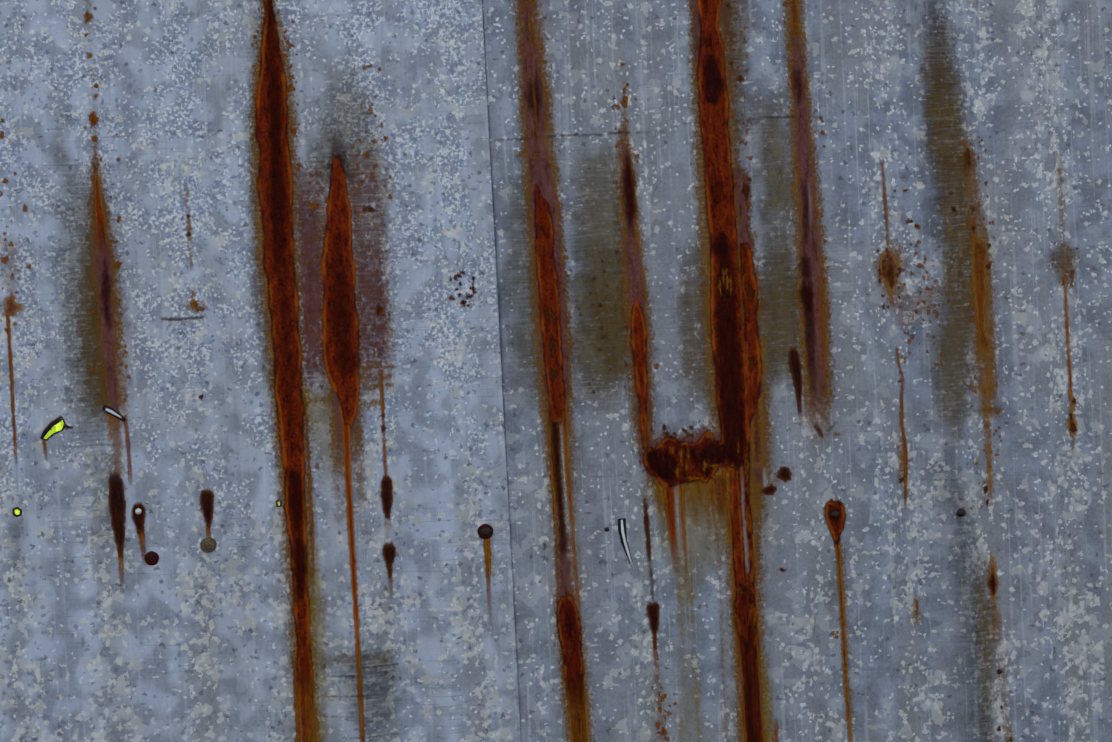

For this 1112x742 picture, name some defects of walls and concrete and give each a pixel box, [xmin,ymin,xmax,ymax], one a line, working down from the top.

rust [69,83,146,575]
rust [200,490,214,537]
rust [251,0,394,742]
rust [383,543,396,584]
rust [483,538,491,592]
rust [509,0,591,742]
rust [612,0,791,742]
rust [784,0,839,437]
rust [824,499,852,742]